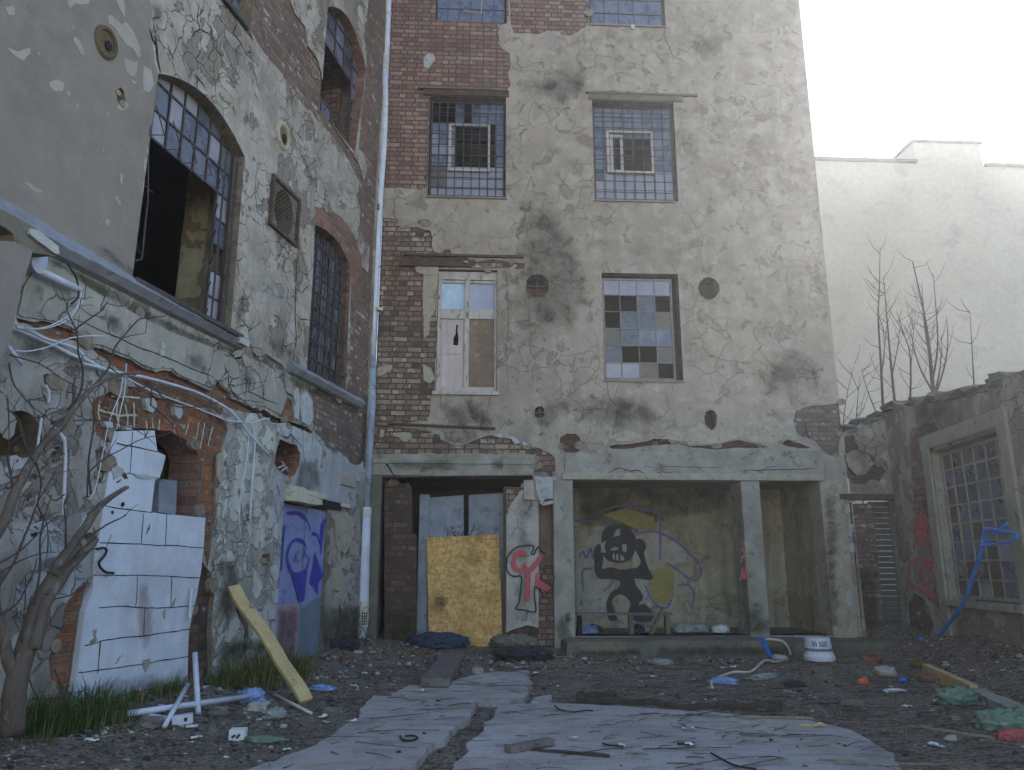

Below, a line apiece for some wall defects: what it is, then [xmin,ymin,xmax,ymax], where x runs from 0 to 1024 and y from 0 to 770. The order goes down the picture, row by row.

peeling [7,47,40,61]
crack [149,28,161,72]
crack [191,7,254,90]
crack [74,318,313,451]
crack [262,248,309,359]
flaking render [16,0,594,680]
flaking render [603,398,885,488]
flaking render [44,550,91,703]